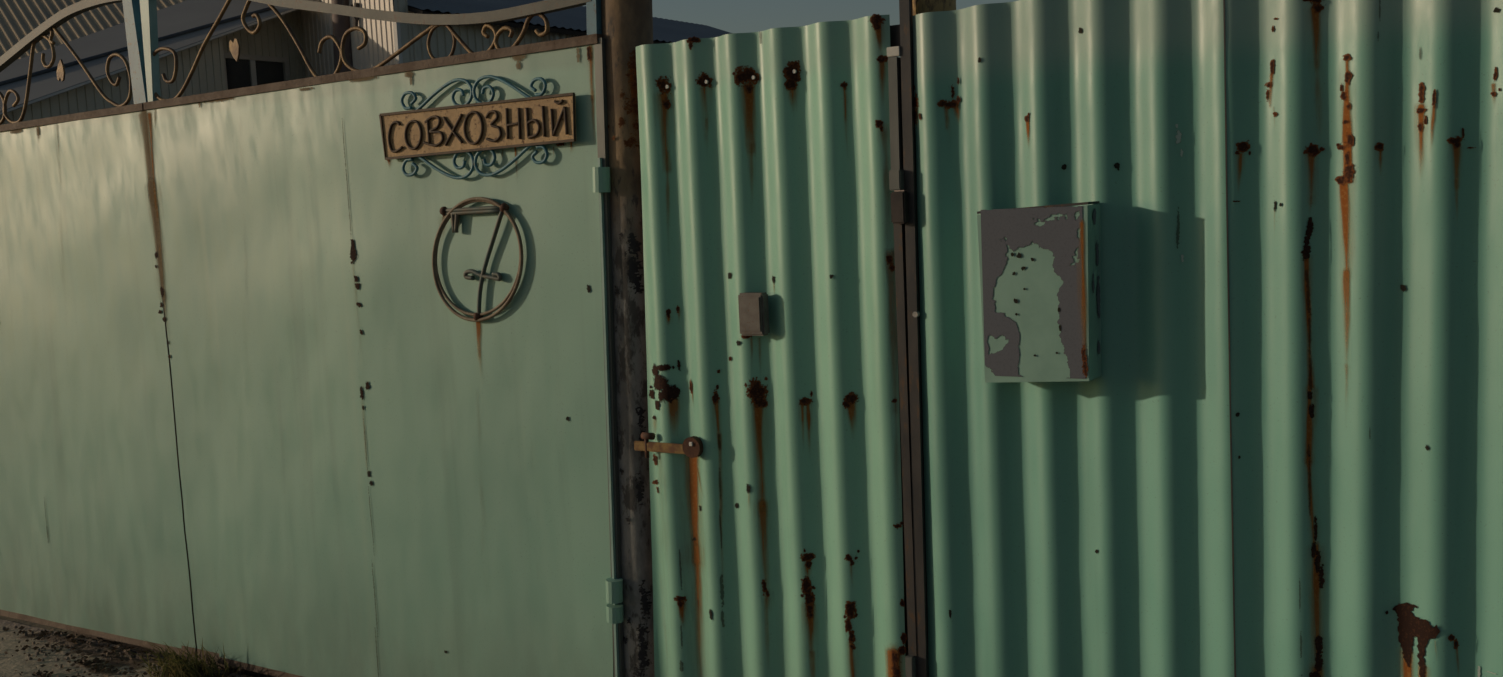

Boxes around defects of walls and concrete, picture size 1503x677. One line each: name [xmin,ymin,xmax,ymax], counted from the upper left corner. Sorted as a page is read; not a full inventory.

corrosion [607,50,640,149]
corrosion [655,76,672,170]
corrosion [695,72,713,100]
corrosion [732,65,760,152]
corrosion [783,60,801,101]
corrosion [1416,82,1476,185]
corrosion [1303,53,1355,341]
corrosion [842,392,858,424]
corrosion [744,377,770,597]
corrosion [674,457,701,640]
corrosion [800,548,816,671]
corrosion [843,601,858,677]